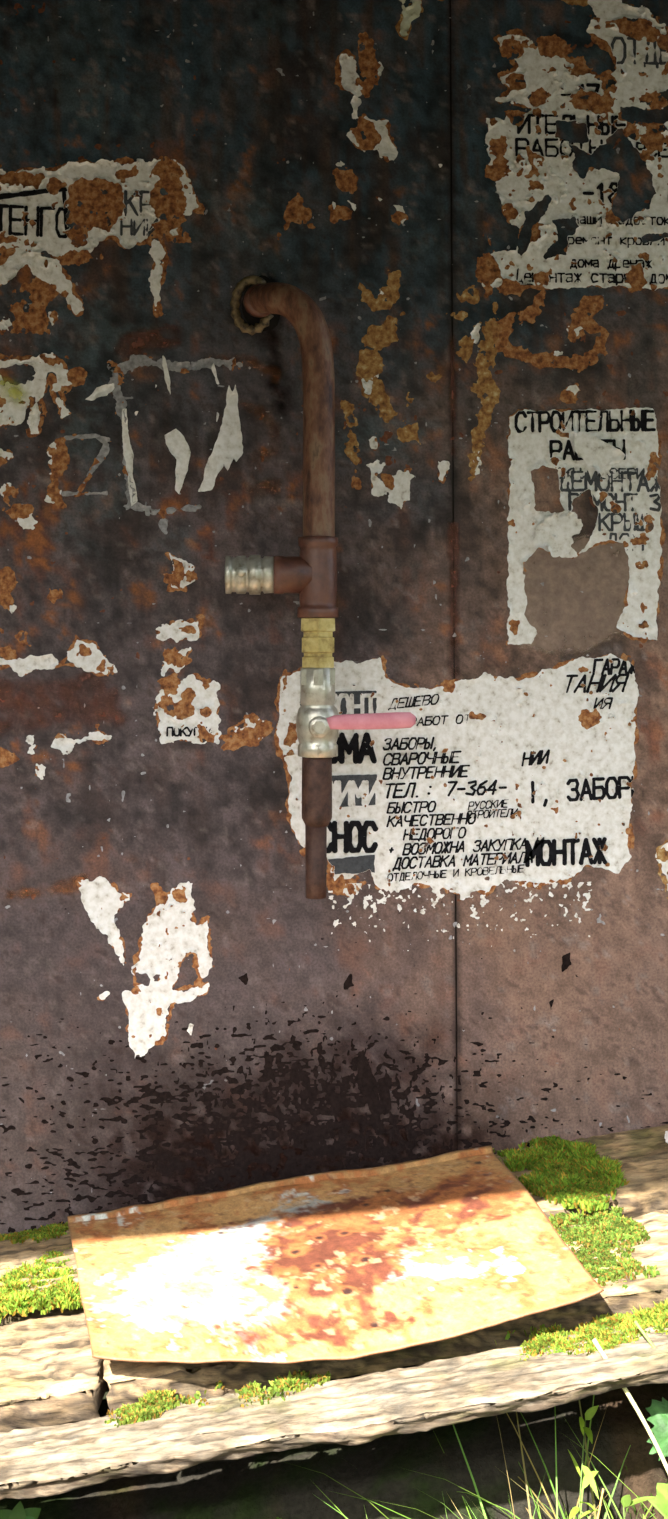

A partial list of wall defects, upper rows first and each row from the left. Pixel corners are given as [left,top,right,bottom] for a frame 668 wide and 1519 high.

corrosion [0,277,58,335]
peeling [86,347,263,423]
corrosion [340,270,421,475]
corrosion [426,288,626,481]
peeling [0,435,38,530]
corrosion [32,430,111,509]
peeling [61,433,202,534]
peeling [152,552,198,605]
peeling [135,614,264,775]
corrosion [219,713,274,751]
corrosion [56,875,86,892]